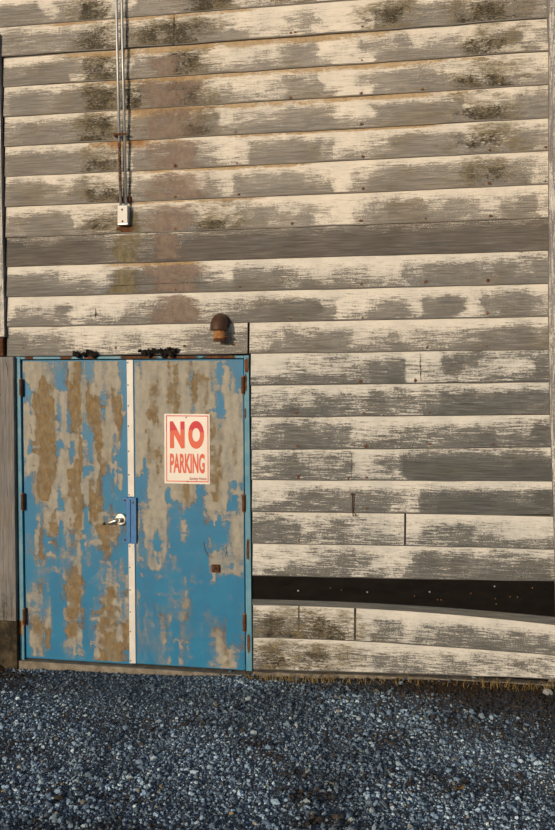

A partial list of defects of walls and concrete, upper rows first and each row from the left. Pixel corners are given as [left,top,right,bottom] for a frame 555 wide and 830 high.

corrosion [111,55,204,323]
damp [49,0,443,293]
damp [443,0,531,186]
peeling [0,0,555,662]
peeling [210,627,239,669]
damp [253,606,368,671]
peeling [253,605,555,679]